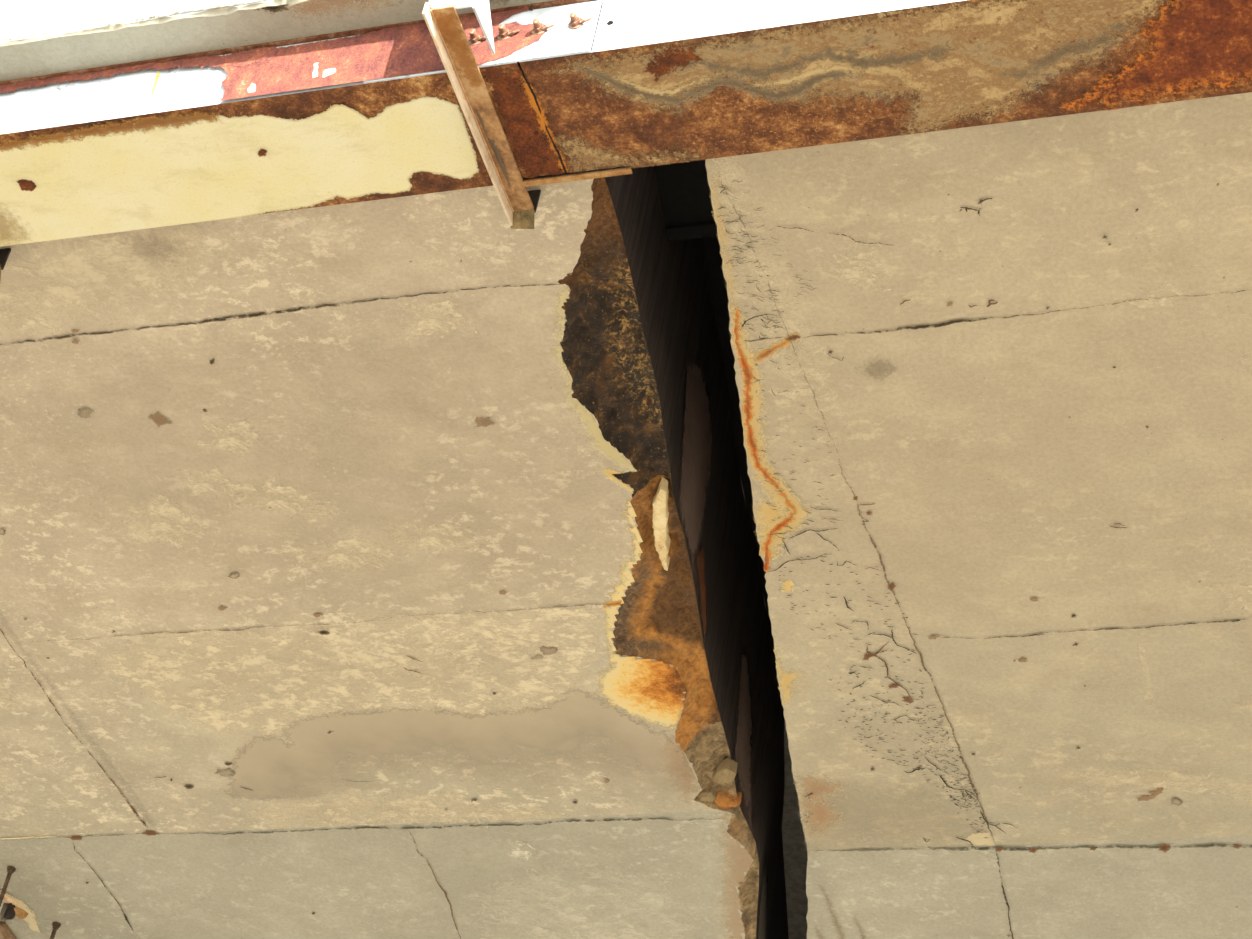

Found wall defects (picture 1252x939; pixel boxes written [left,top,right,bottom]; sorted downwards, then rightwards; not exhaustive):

rust [17,179,37,191]
peeling [0,96,479,247]
rust [0,7,569,180]
rust [643,44,702,82]
rust [1060,0,1252,111]
spalling [558,177,759,939]
rust [732,309,808,572]
crack [718,181,1016,849]
water stain [108,607,692,827]
spalling [531,646,558,659]